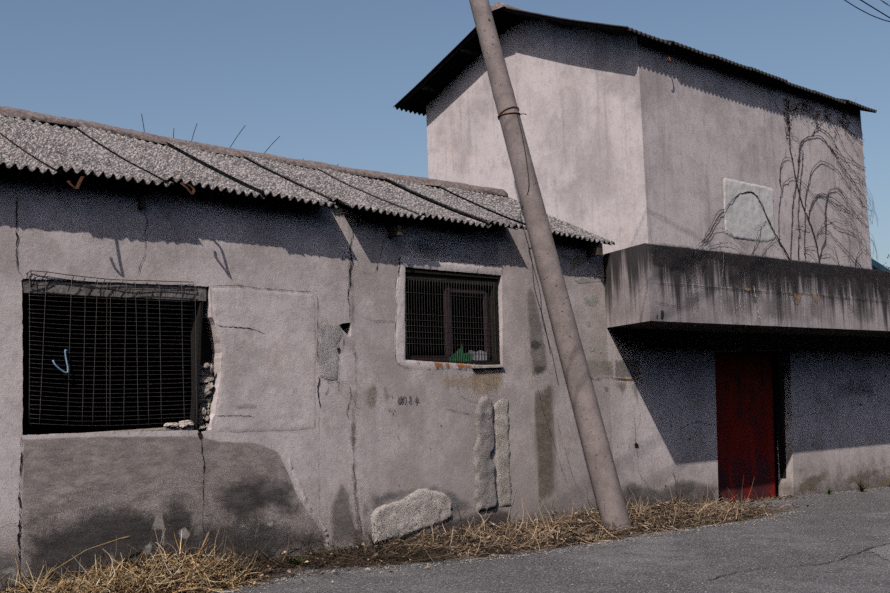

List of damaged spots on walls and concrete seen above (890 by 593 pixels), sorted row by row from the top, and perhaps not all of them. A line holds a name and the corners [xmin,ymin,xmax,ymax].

spalling [197,361,215,439]
crack [218,285,355,441]
crack [345,214,495,369]
damp [652,244,890,319]
crack [1,436,22,590]
damp [0,436,325,593]
crack [201,439,211,540]
damp [333,489,361,544]